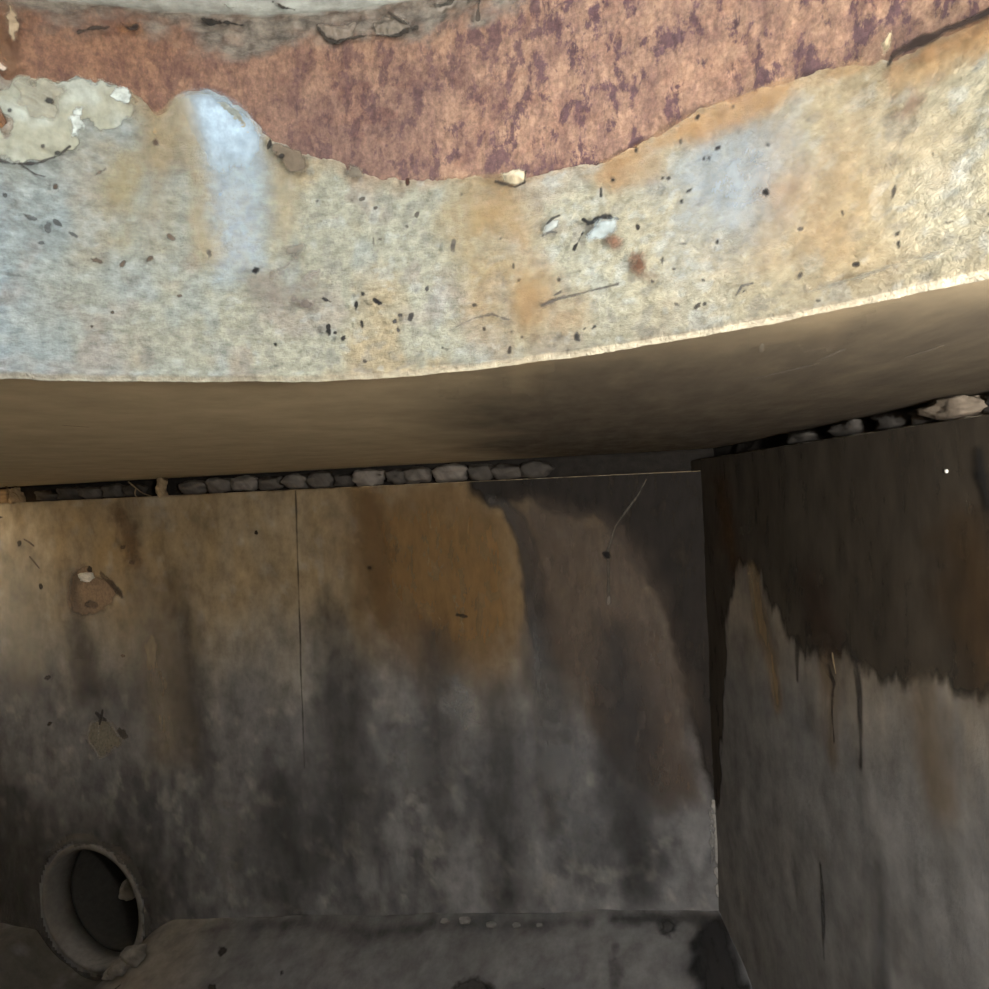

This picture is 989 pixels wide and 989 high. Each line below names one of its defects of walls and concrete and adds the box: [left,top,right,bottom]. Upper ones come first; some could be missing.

peeling [317,11,419,45]
spalling [881,7,989,69]
peeling [495,169,527,188]
hole [24,214,78,245]
spalling [78,566,123,598]
leakage [470,415,989,898]
leakage [0,799,88,974]